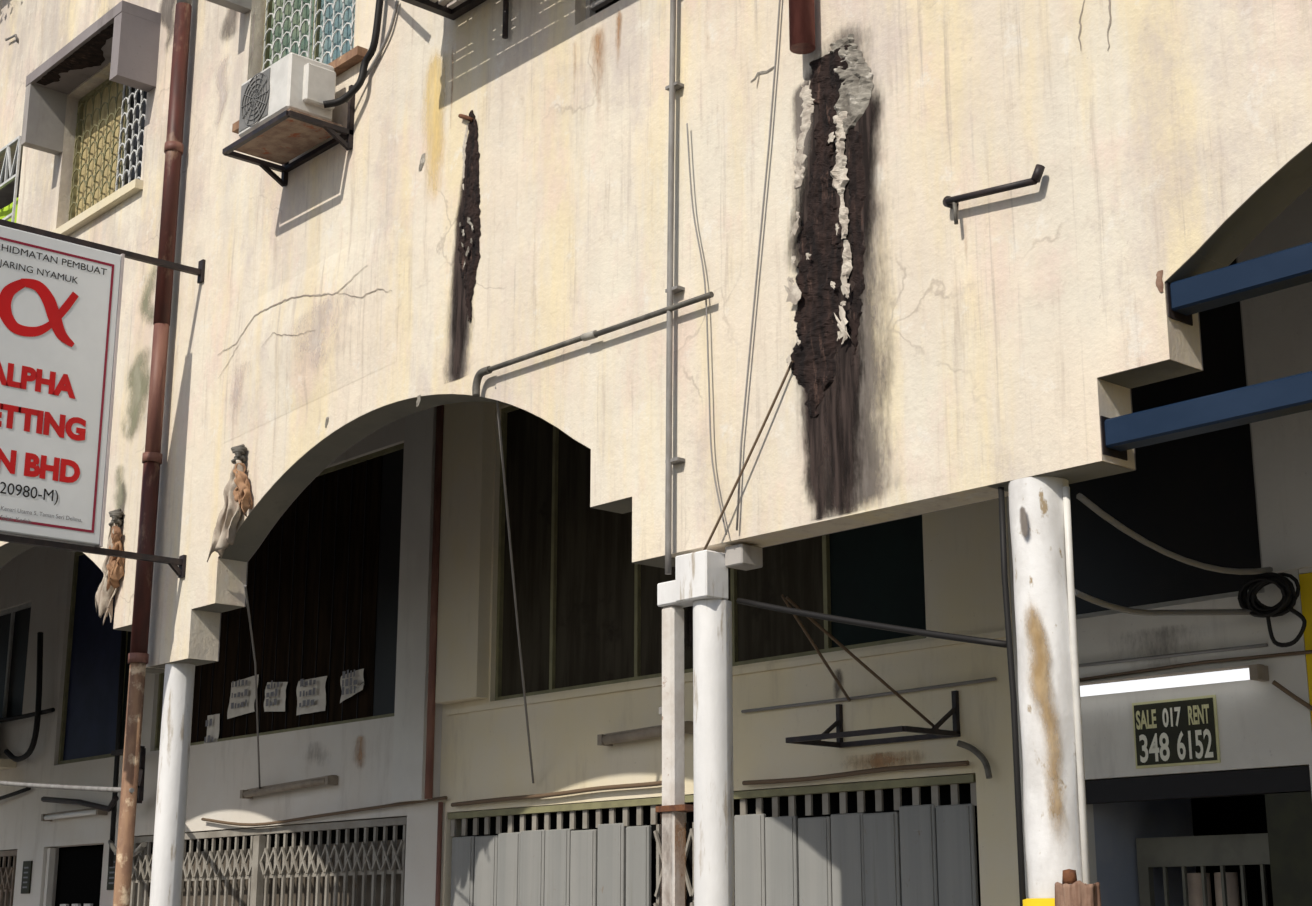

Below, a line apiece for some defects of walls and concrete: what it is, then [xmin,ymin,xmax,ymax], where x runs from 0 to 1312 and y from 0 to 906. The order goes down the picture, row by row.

water stain [426,57,445,177]